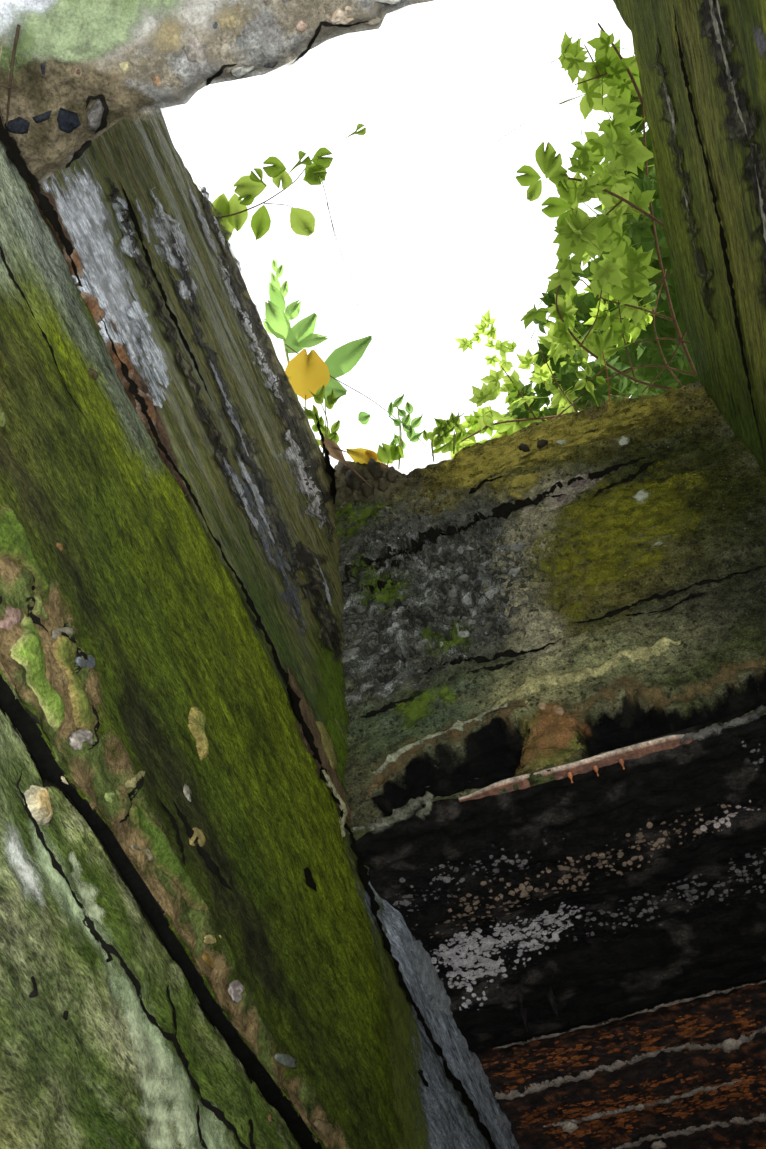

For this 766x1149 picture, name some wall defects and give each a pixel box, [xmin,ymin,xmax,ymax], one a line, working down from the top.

crack [292,21,369,64]
crack [0,116,83,287]
crack [341,457,658,594]
crack [360,565,765,718]
crack [99,315,496,1149]
spalling [367,658,766,816]
spalling [0,505,352,1149]
crack [0,674,322,1149]
peeling [385,800,766,1019]
peeling [562,1122,578,1133]
rust [482,1000,766,1149]
peeling [721,1038,740,1052]